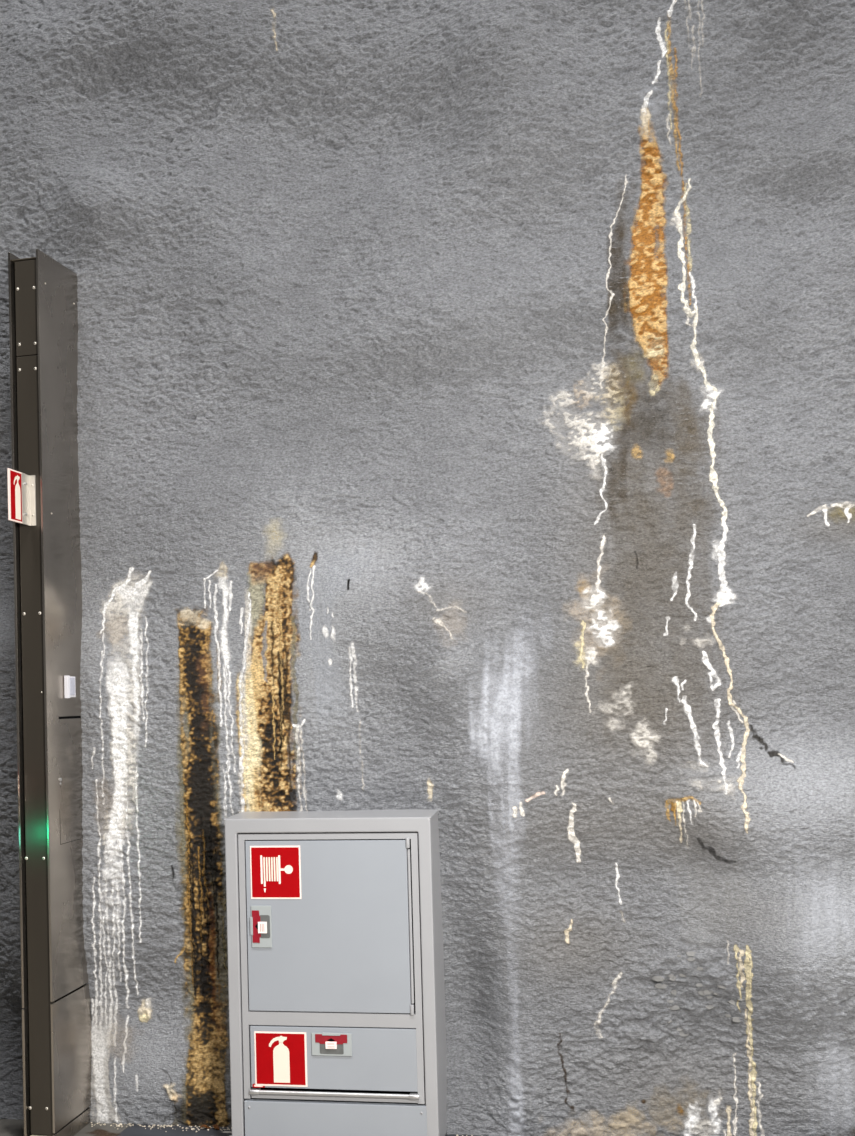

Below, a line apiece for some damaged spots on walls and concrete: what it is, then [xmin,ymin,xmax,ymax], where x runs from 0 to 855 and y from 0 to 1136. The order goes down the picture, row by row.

crack [641,0,677,139]
crack [599,176,628,388]
rust [628,108,668,395]
crack [594,452,608,592]
damp [555,357,663,496]
crack [664,179,795,833]
damp [91,567,152,1123]
rust [175,608,231,1127]
damp [203,566,244,825]
rust [236,552,317,813]
rust [666,796,702,844]
damp [684,944,763,1136]